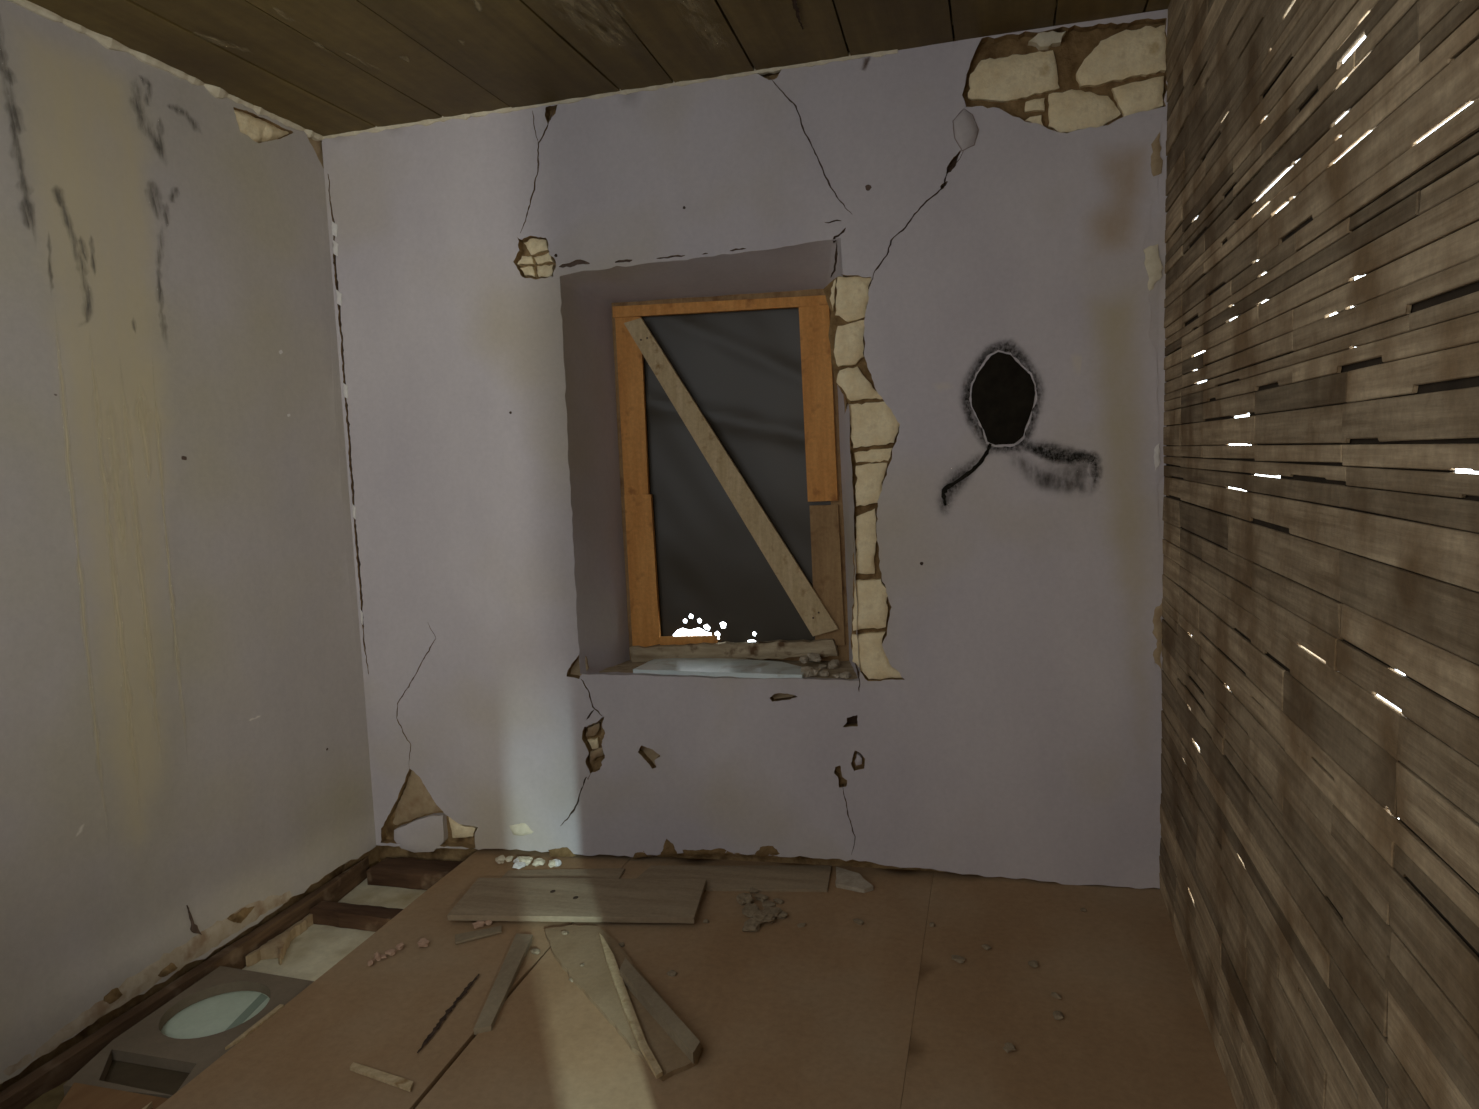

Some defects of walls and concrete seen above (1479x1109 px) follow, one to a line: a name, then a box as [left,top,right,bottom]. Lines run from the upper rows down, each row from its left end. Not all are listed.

flaking render [963,23,1167,133]
crack [768,77,852,278]
crack [868,153,962,289]
flaking render [1151,132,1163,176]
water stain [0,0,183,883]
flaking render [824,276,902,680]
spalling [386,770,478,853]
spalling [586,717,605,770]